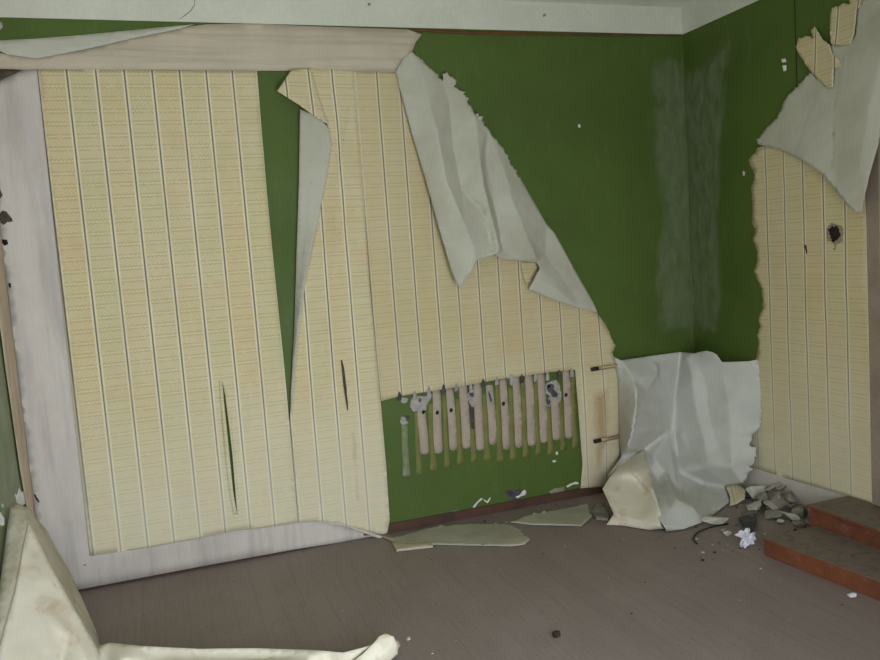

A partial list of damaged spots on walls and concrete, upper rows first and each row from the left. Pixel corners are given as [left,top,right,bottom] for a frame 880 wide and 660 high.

spalling [826,223,844,250]
spalling [545,380,561,407]
spalling [400,395,431,425]
peeling [15,488,26,505]
spalling [505,489,527,501]